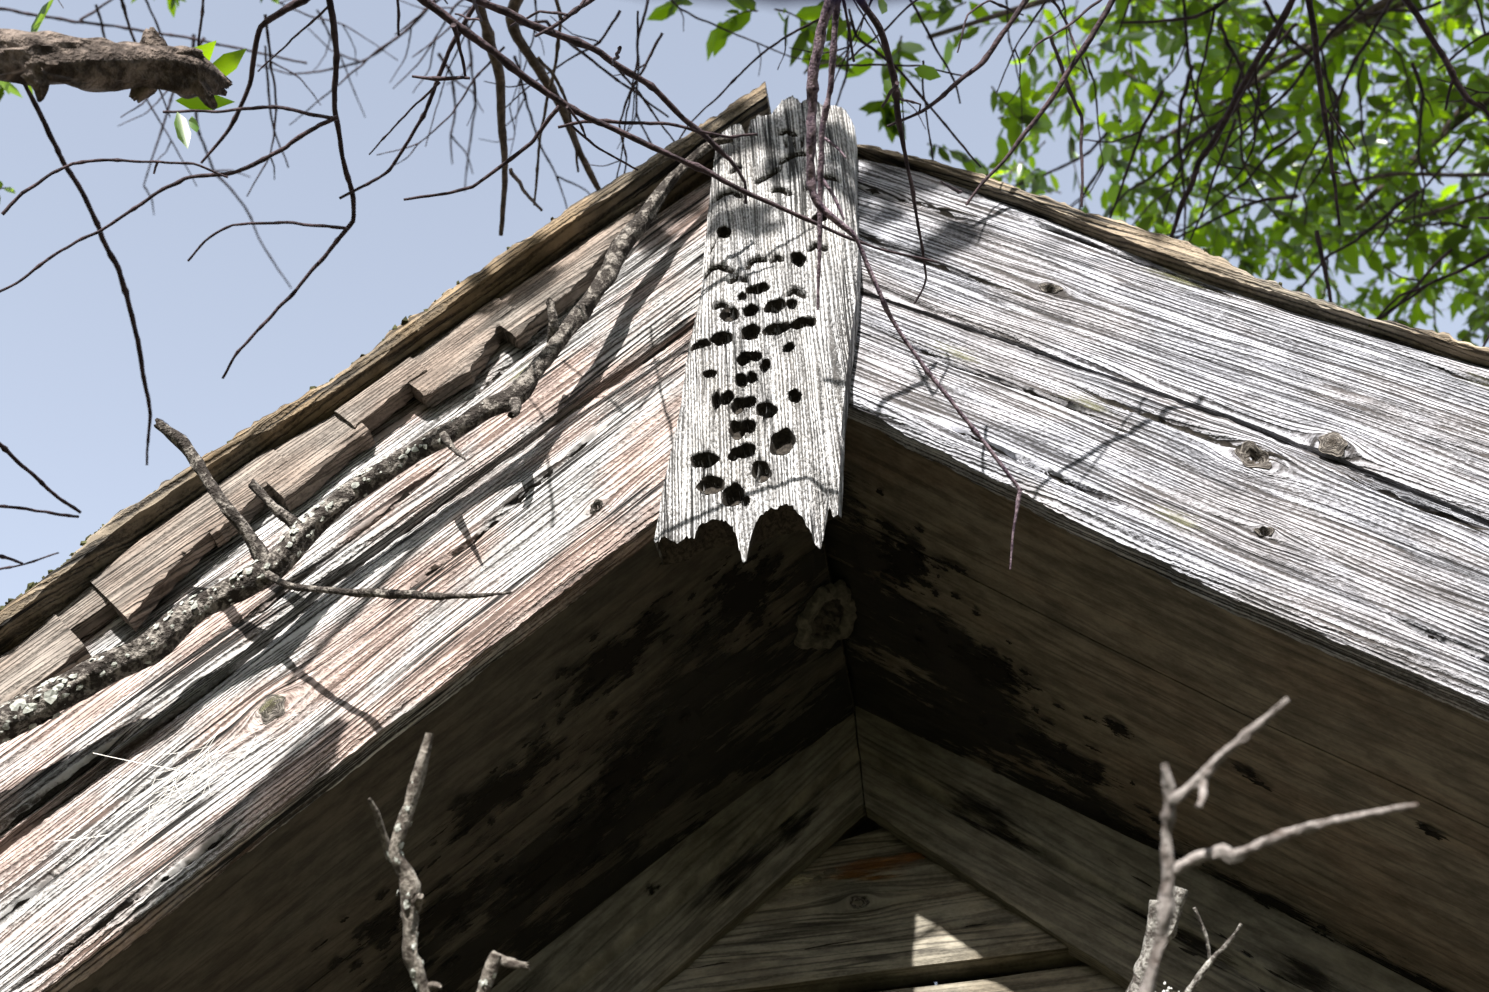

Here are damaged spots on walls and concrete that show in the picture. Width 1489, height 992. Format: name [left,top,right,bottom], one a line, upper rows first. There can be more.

leakage [701,807,818,903]